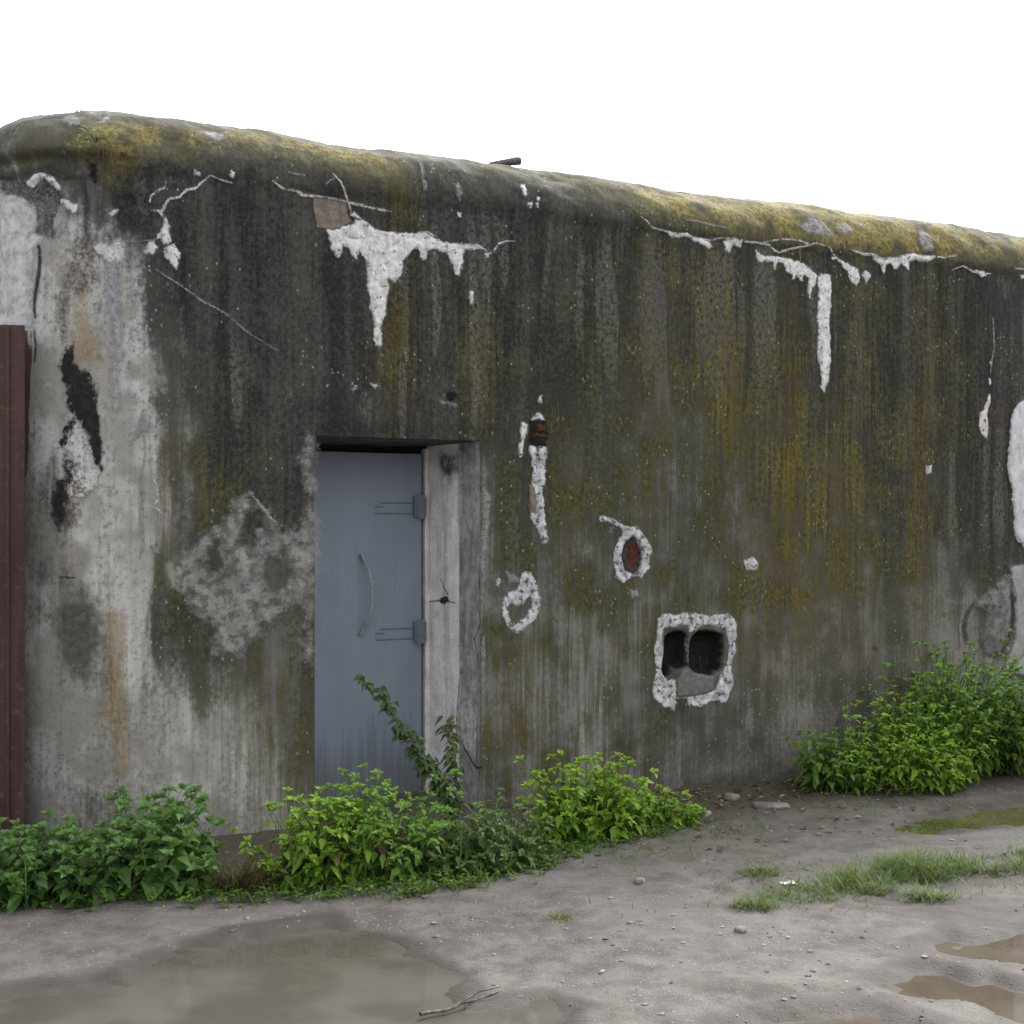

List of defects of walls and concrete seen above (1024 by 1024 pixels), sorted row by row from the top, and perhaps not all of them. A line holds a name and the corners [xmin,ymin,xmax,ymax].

peeling [0,161,127,410]
damp [145,219,180,268]
crack [112,170,235,242]
crack [156,269,278,351]
damp [327,213,489,346]
crack [641,216,891,260]
damp [756,250,832,391]
damp [832,253,934,285]
crack [931,255,1024,274]
spalling [518,396,549,544]
spalling [1007,401,1024,547]
spalling [653,612,737,711]